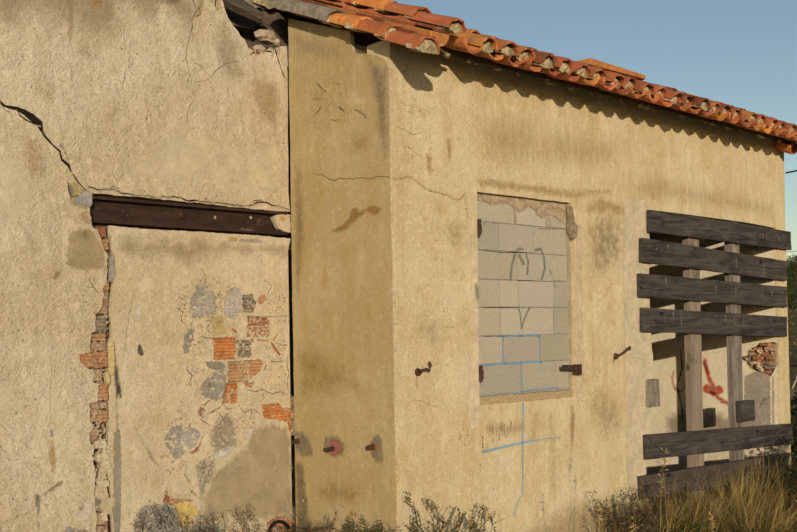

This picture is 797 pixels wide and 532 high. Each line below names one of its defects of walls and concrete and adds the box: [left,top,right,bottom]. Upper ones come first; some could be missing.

crack [185,0,239,82]
crack [0,61,289,211]
crack [311,173,466,200]
flaking render [66,182,116,532]
flaking render [184,280,295,457]
flaking render [742,342,778,376]
flaking render [163,480,198,527]